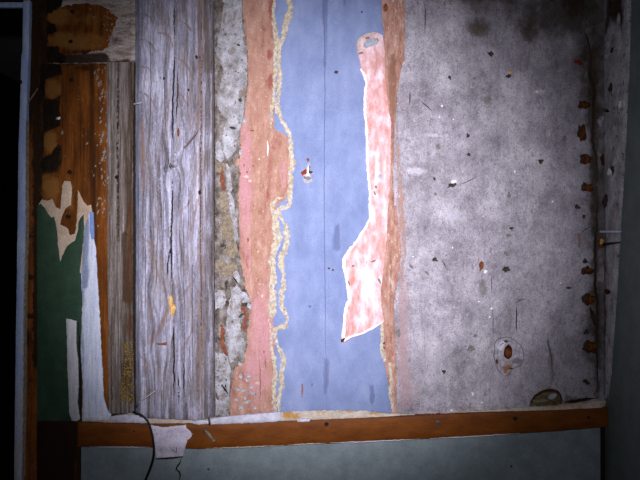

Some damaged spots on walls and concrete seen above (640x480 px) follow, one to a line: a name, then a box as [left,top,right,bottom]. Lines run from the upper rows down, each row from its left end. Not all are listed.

peeling [37,63,111,421]
peeling [46,3,120,55]
crack [117,1,228,416]
flaking render [214,0,260,417]
peeling [261,0,314,412]
peeling [341,32,401,412]